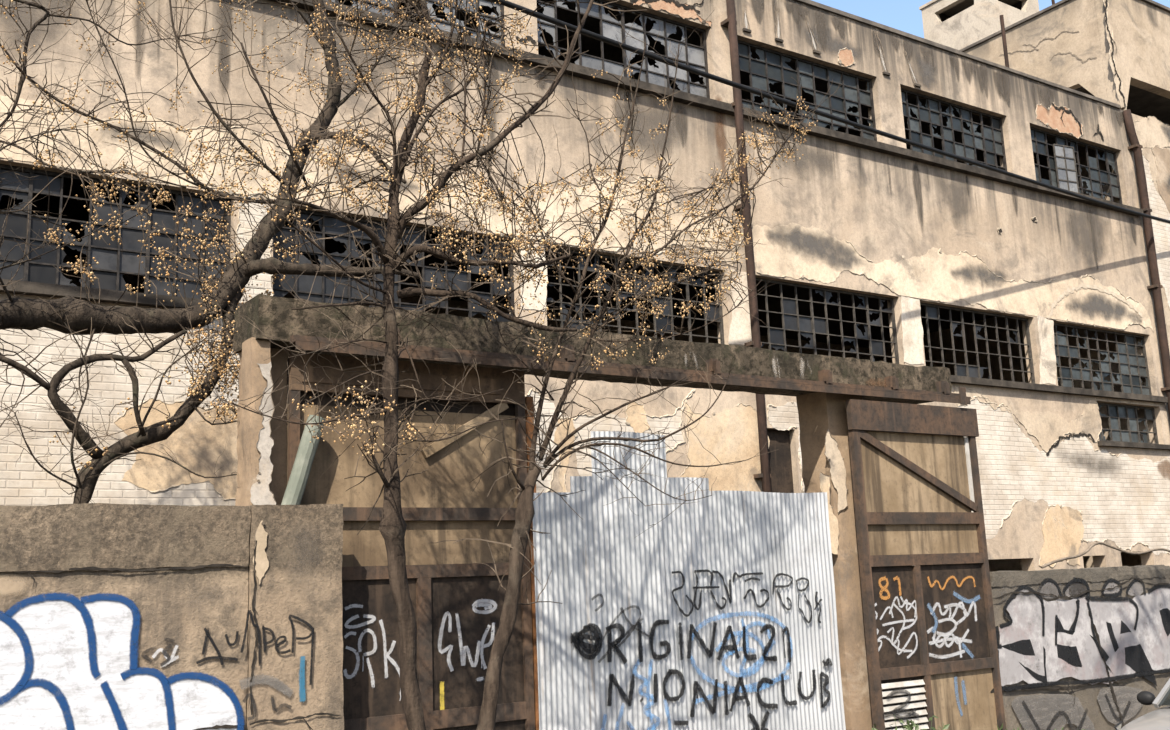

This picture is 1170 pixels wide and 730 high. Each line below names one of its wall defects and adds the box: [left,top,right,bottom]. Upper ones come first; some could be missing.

water stain [0,0,67,44]
water stain [219,0,232,89]
crack [999,0,1126,108]
peeling [0,95,290,251]
water stain [913,165,923,224]
crack [1052,102,1104,141]
peeling [295,149,1154,385]
water stain [769,230,857,268]
flaking render [0,313,276,506]
flaking render [955,386,1170,568]
crack [1046,432,1095,456]
crack [12,540,340,730]